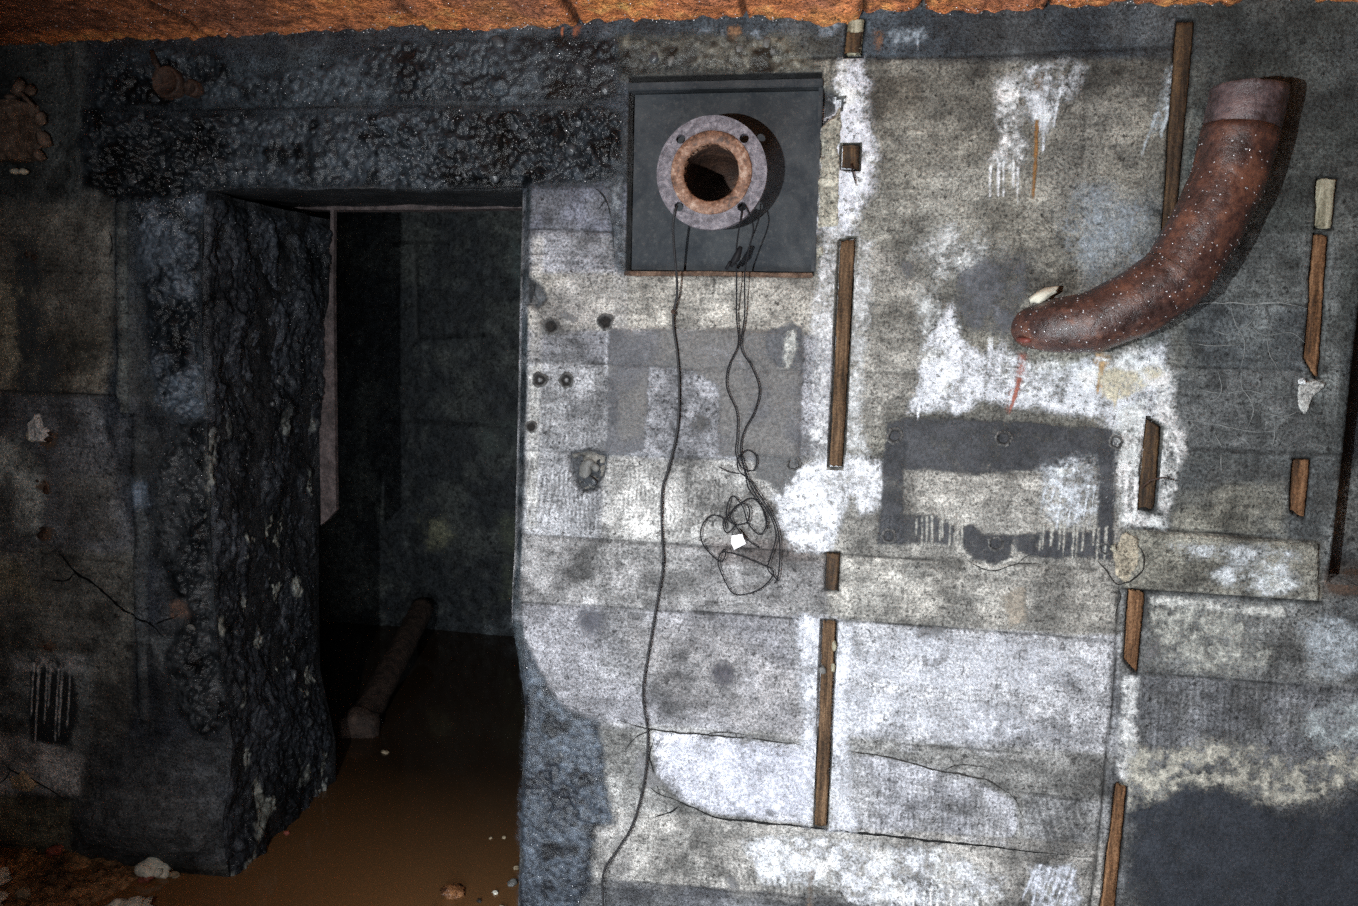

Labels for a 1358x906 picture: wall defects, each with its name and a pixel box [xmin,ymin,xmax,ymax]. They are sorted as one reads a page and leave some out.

damp [989,65,1083,197]
damp [1142,67,1172,152]
damp [754,58,883,553]
corrosion [1009,355,1025,410]
damp [910,223,1186,530]
damp [1063,186,1146,282]
crack [50,546,181,639]
crack [617,720,1094,889]
damp [668,614,1083,906]
damp [1117,676,1358,906]